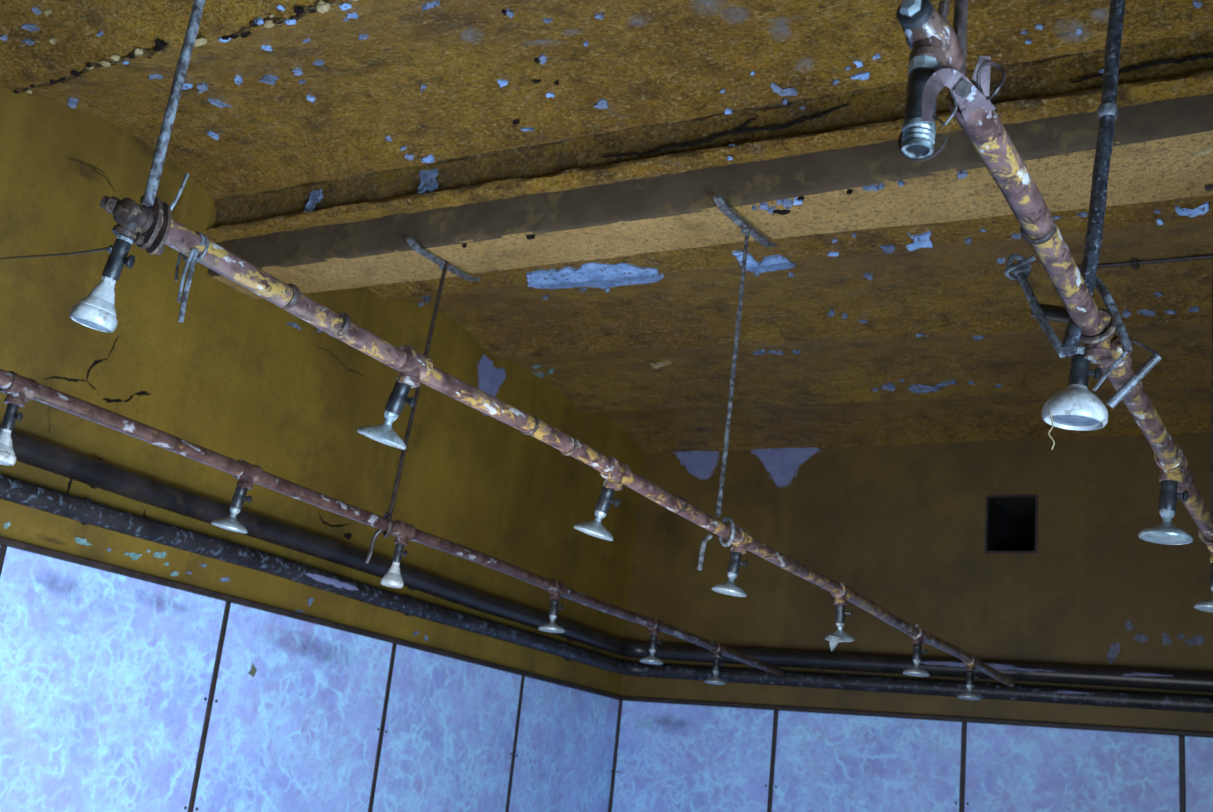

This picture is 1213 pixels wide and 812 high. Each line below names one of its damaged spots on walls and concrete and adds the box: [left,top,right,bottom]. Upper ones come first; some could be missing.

peeling [22,7,51,45]
peeling [422,1,440,11]
peeling [183,82,232,108]
peeling [292,60,324,104]
crack [1072,54,1213,83]
crack [601,104,849,158]
peeling [384,136,438,194]
peeling [526,262,663,300]
crack [45,336,151,433]
peeling [477,353,506,397]
peeling [674,451,720,480]
peeling [751,447,821,489]